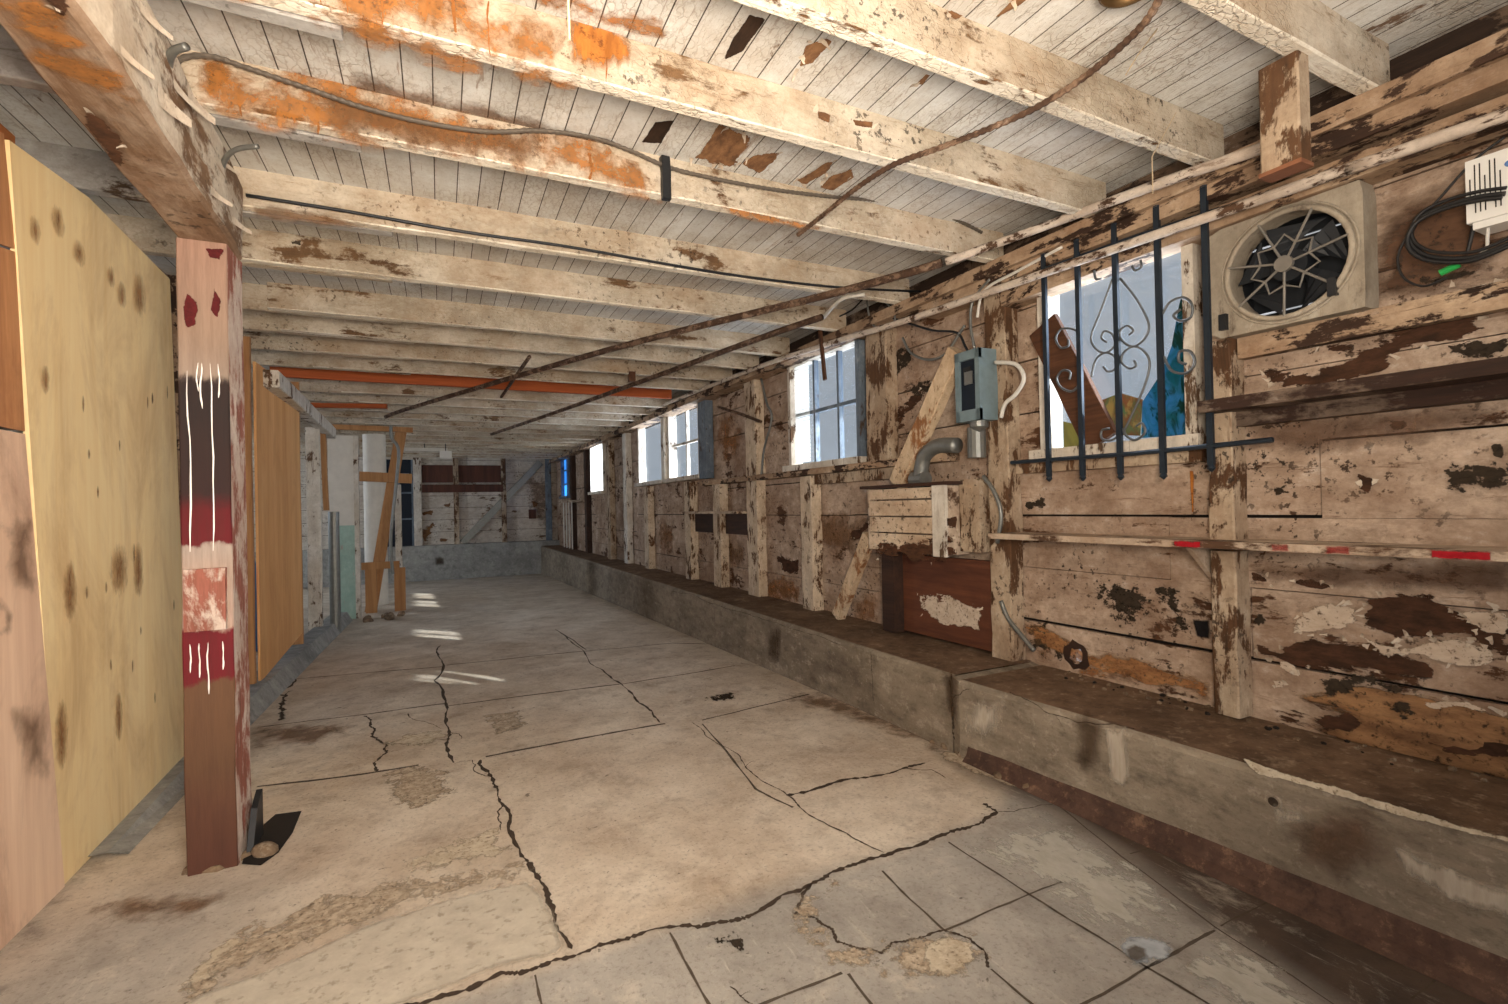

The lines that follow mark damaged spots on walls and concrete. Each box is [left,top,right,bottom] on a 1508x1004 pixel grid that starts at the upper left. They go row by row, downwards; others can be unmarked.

peeling [792,38,831,83]
peeling [689,124,783,173]
peeling [793,159,854,190]
peeling [1259,316,1489,388]
peeling [898,380,932,429]
water stain [16,530,28,581]
peeling [917,593,983,630]
peeling [1252,572,1508,688]
crack [278,679,297,721]
crack [1010,692,1134,729]
crack [364,629,1052,1004]
spalling [180,828,530,1000]